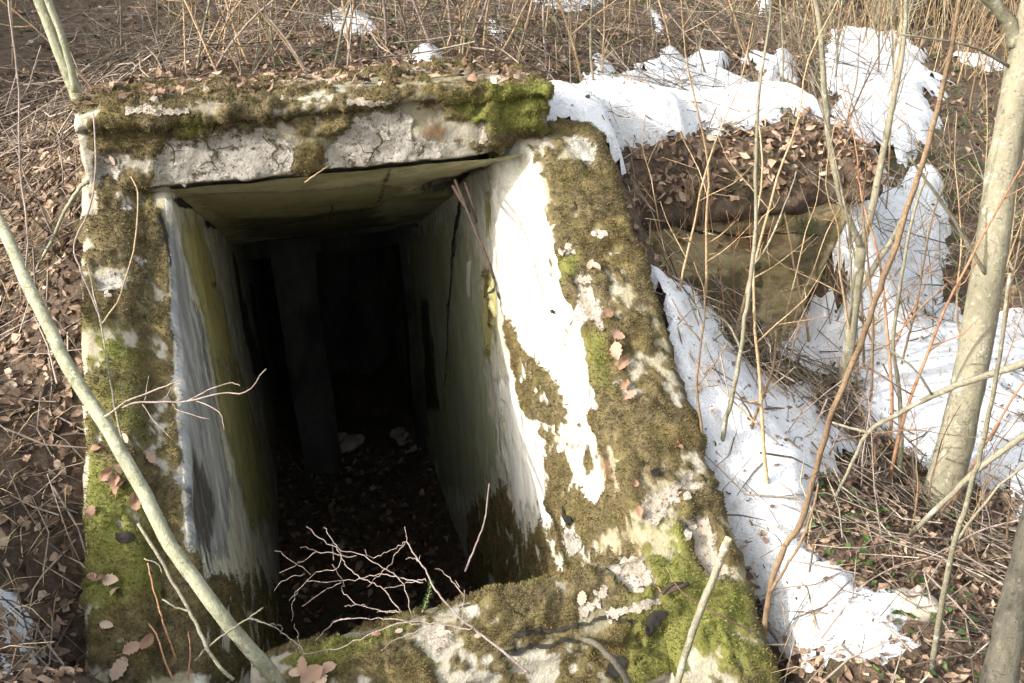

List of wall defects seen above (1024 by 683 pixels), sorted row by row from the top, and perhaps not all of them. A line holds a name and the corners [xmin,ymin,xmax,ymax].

crack [164,138,237,171]
crack [262,136,291,172]
crack [361,132,390,164]
crack [401,201,461,406]